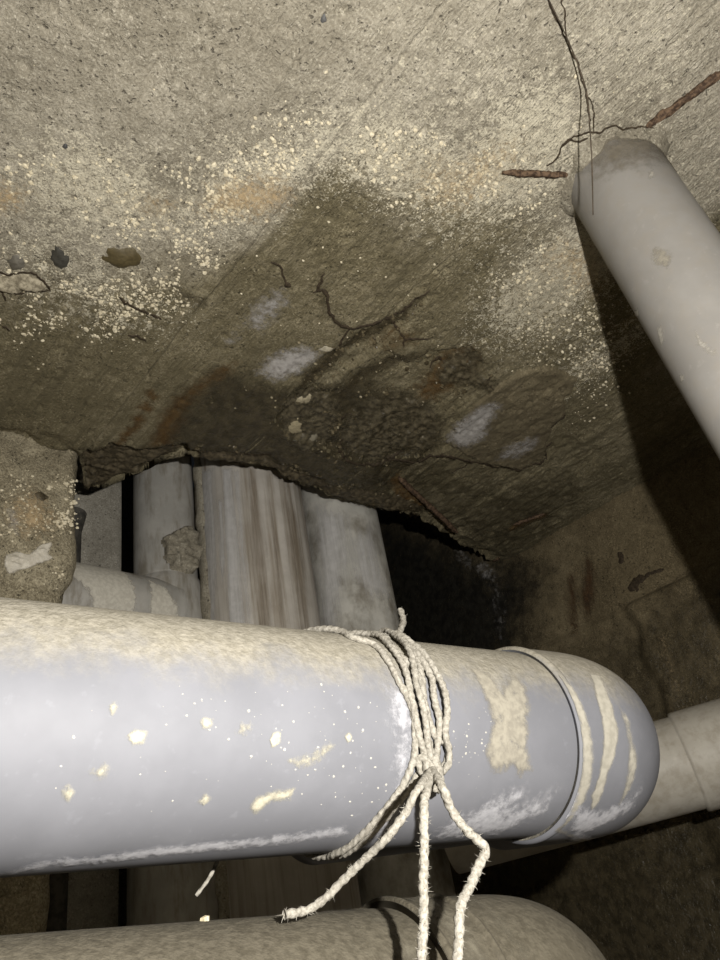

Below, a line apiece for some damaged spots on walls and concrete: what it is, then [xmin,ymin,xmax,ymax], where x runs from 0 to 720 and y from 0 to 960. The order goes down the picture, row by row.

crack [546,0,654,166]
corrosion [646,71,720,128]
leakage [343,126,525,214]
corrosion [502,169,568,179]
leakage [0,109,331,350]
spalling [0,274,46,300]
crack [313,273,445,368]
leakage [471,232,630,434]
leakage [161,303,432,494]
spalling [80,443,182,489]
spalling [195,445,432,515]
crack [380,415,566,473]